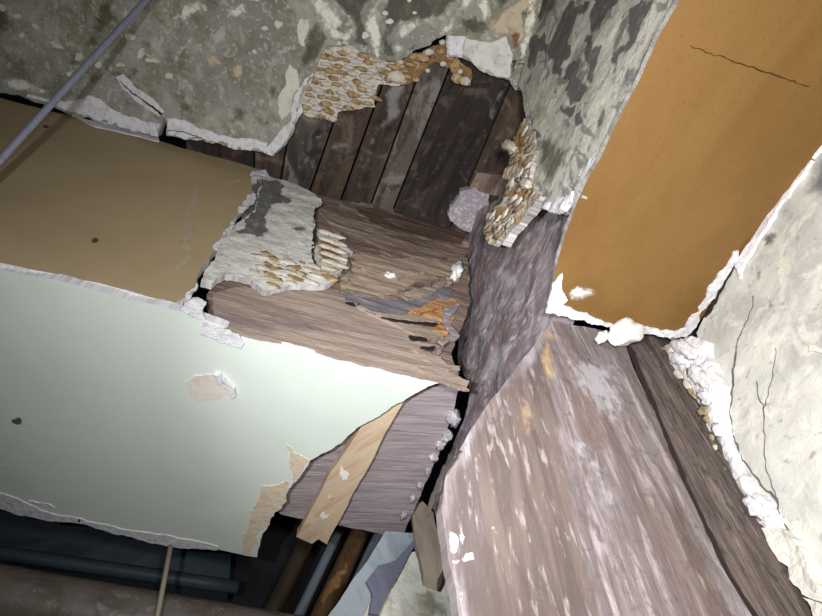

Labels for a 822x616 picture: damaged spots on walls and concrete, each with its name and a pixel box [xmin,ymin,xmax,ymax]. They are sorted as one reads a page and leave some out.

peeling [172,1,207,20]
peeling [229,4,246,16]
flaking render [297,19,310,47]
peeling [311,0,617,126]
peeling [611,0,653,73]
crack [690,45,809,87]
flaking render [483,118,596,248]
flaking render [200,175,353,296]
crack [729,295,789,531]
flaking render [661,336,822,616]
peeling [450,532,464,553]